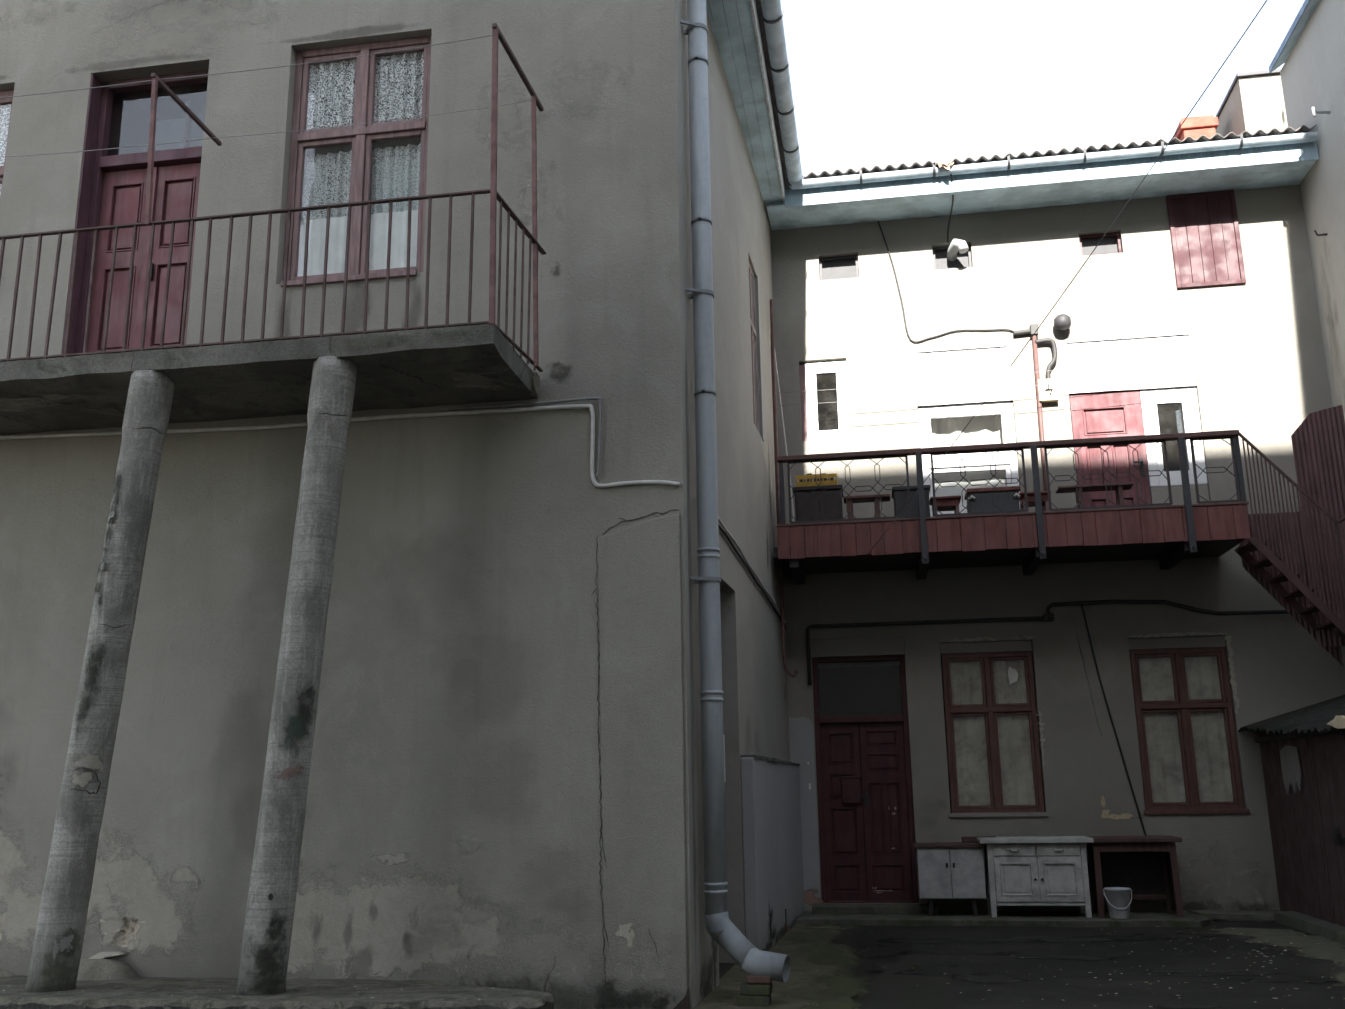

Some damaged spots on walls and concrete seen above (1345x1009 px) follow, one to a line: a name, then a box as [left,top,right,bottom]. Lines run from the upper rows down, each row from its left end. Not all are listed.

peeling [71,752,103,795]
water stain [76,644,106,734]
water stain [285,686,315,753]
crack [592,509,679,1004]
flaking render [85,830,199,955]
flaking render [287,863,513,980]